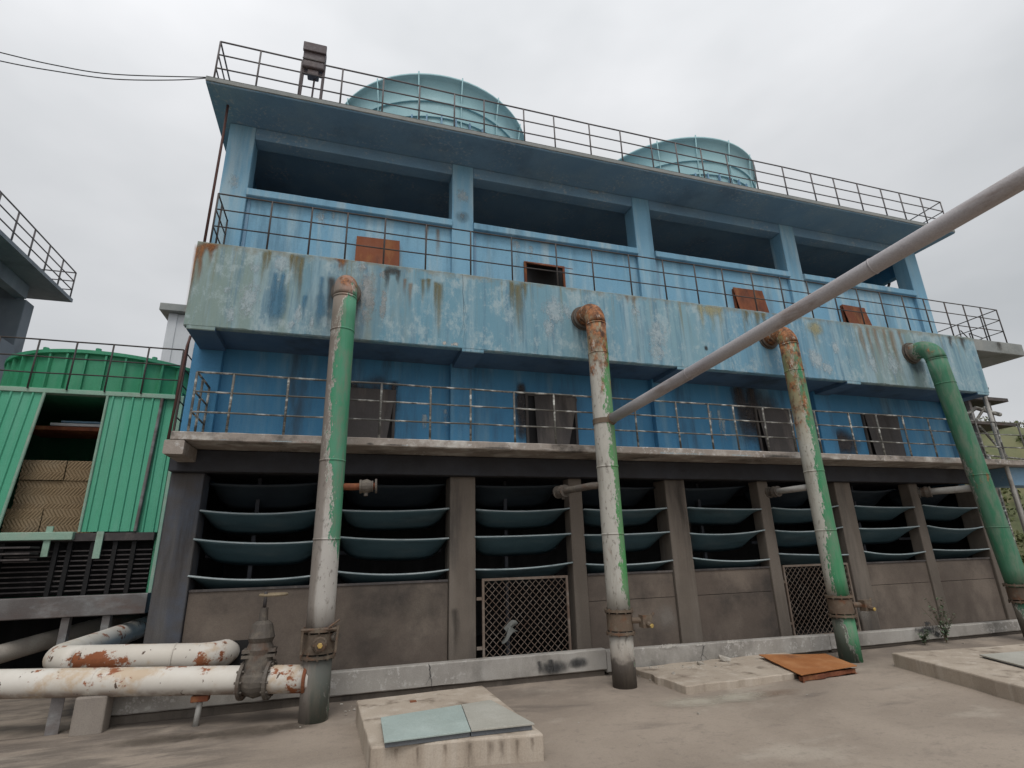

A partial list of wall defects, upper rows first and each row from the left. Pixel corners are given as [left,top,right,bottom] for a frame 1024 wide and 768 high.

rust [192,243,217,276]
water stain [270,254,304,316]